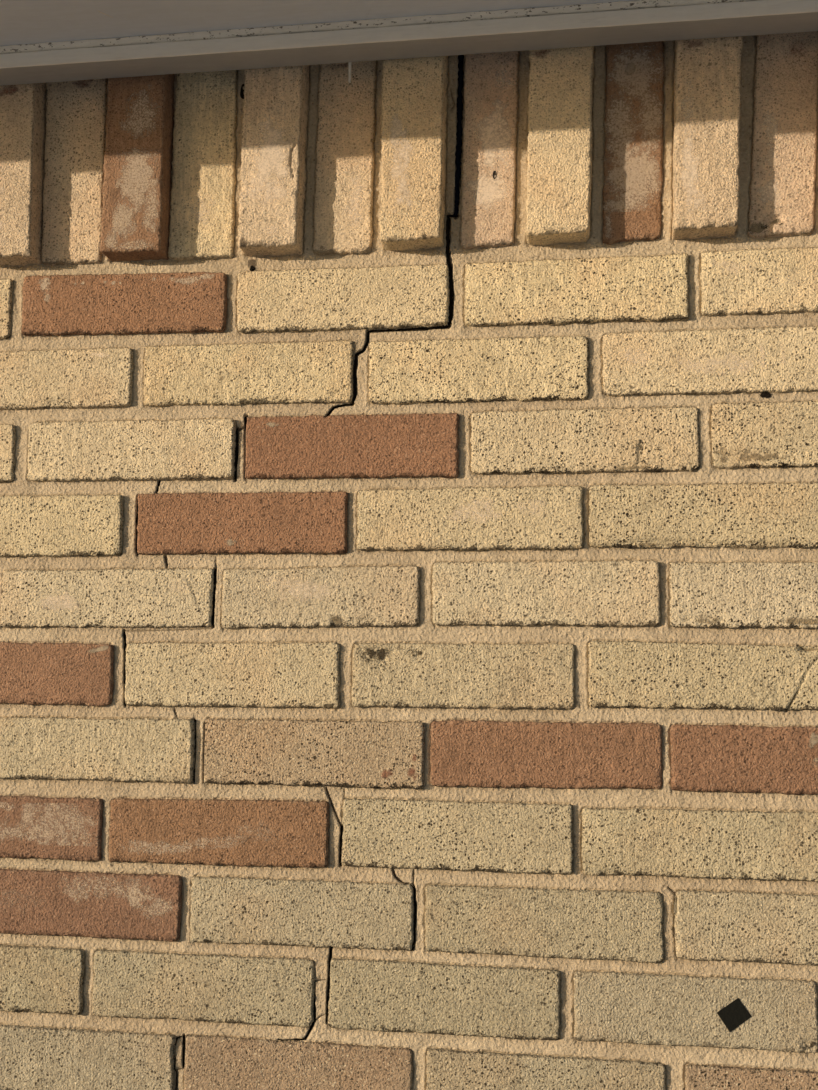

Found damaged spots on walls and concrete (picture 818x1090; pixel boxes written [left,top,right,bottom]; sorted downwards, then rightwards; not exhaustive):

crack [327,55,464,416]
crack [234,416,247,481]
crack [136,481,161,555]
crack [123,559,216,706]
crack [174,709,205,782]
efflorescence [0,802,94,846]
efflorescence [123,838,235,854]
crack [326,789,345,865]
efflorescence [67,876,172,915]
crack [392,869,417,950]
crack [278,947,332,1041]
crack [173,1034,185,1090]